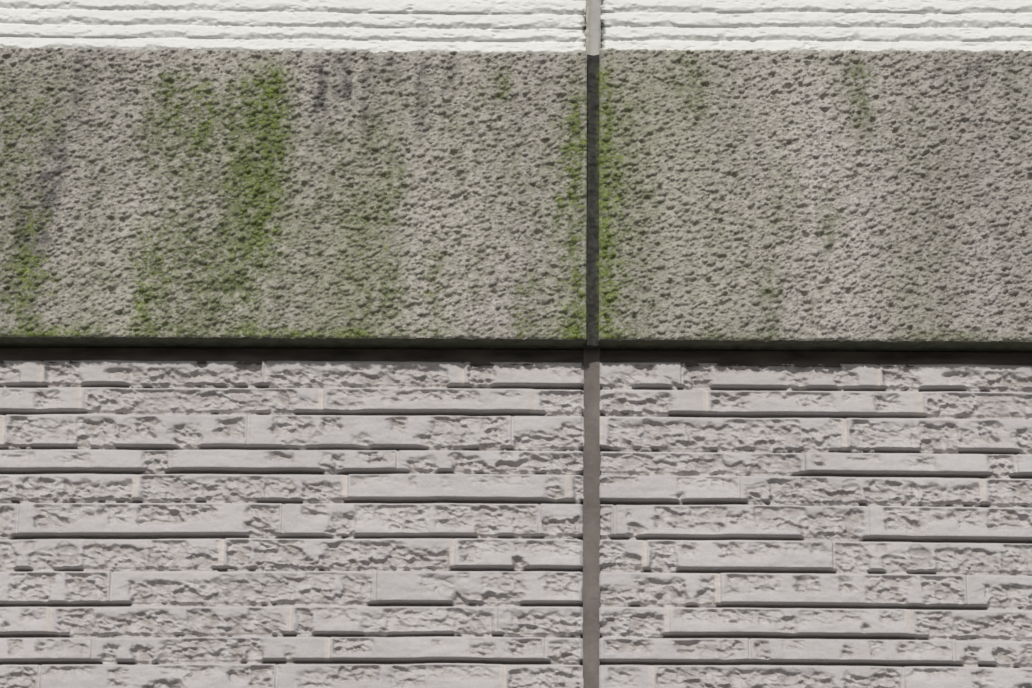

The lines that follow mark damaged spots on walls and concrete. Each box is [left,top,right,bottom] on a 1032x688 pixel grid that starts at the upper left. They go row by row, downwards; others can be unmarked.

damp [0,215,89,338]
damp [132,237,190,337]
damp [147,67,285,305]
damp [557,71,629,340]